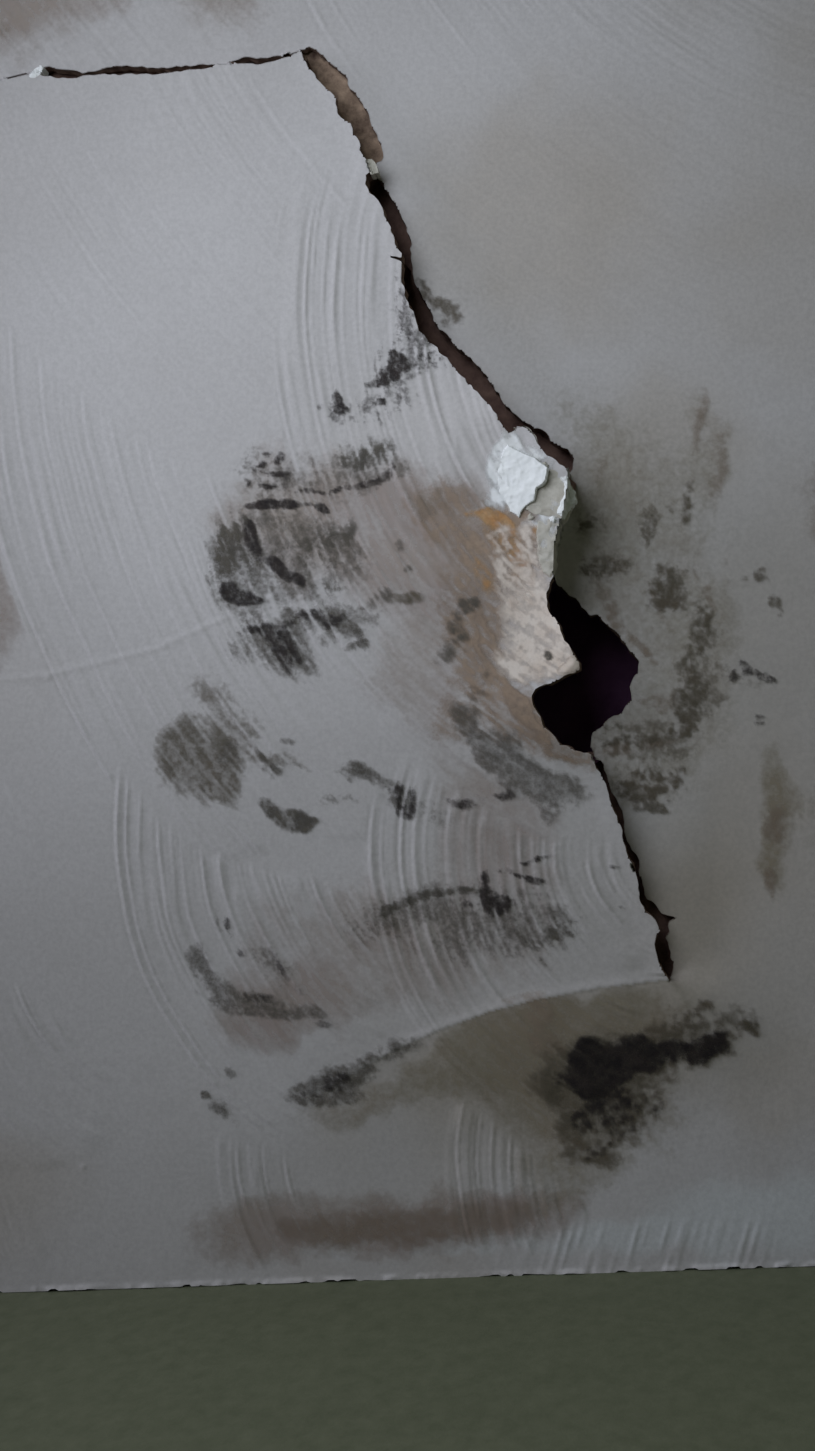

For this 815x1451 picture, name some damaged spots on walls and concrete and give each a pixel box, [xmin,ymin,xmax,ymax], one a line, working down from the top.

flaking render [29,65,49,78]
crack [6,47,576,490]
damp [207,445,489,673]
peeling [486,426,640,757]
mould [160,716,281,801]
mould [260,800,318,833]
damp [371,839,571,960]
mould [452,706,581,813]
crack [590,752,677,982]
damp [620,768,685,813]
mould [290,1042,415,1106]
damp [423,995,758,1172]